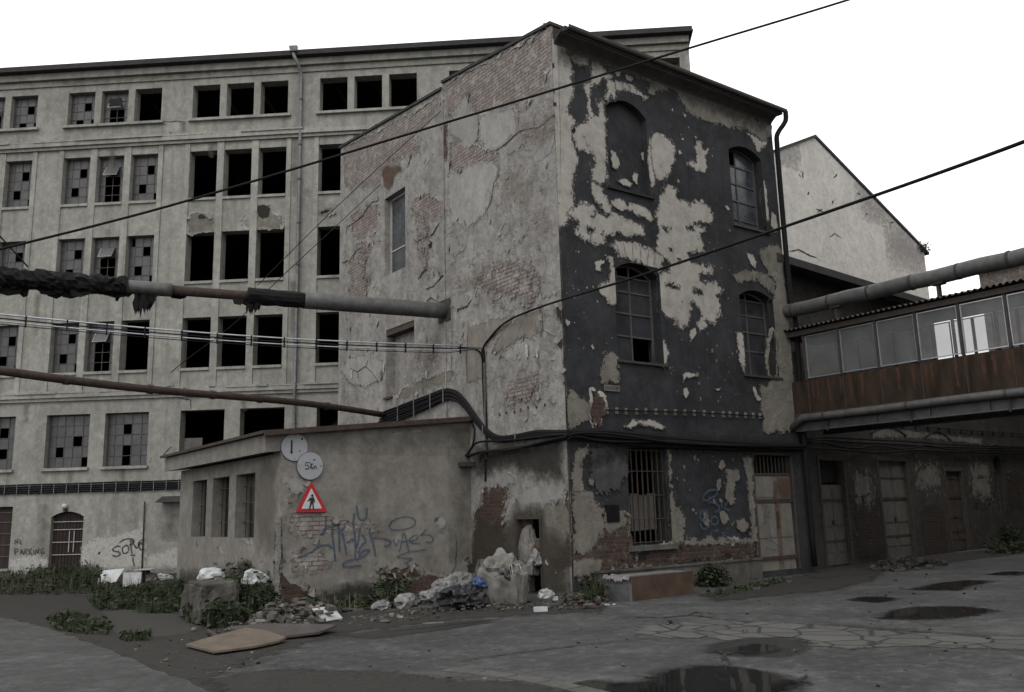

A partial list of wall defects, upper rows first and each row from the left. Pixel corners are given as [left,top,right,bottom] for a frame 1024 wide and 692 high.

peeling [186,210,215,236]
peeling [238,203,285,231]
crack [467,94,561,214]
flaking render [318,23,795,435]
flaking render [272,473,386,604]
flaking render [367,443,759,593]